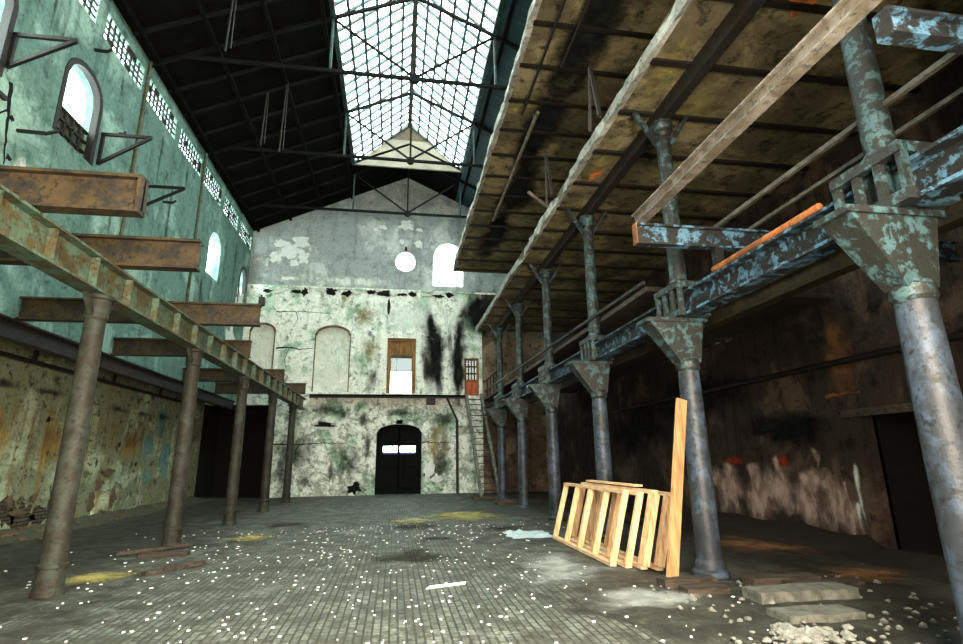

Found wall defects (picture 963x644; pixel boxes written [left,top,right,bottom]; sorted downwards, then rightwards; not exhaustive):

rust [790,0,818,18]
peeling [269,236,310,266]
damp [384,292,495,400]
damp [431,414,450,474]
flaking render [0,492,50,529]
damp [854,465,862,517]